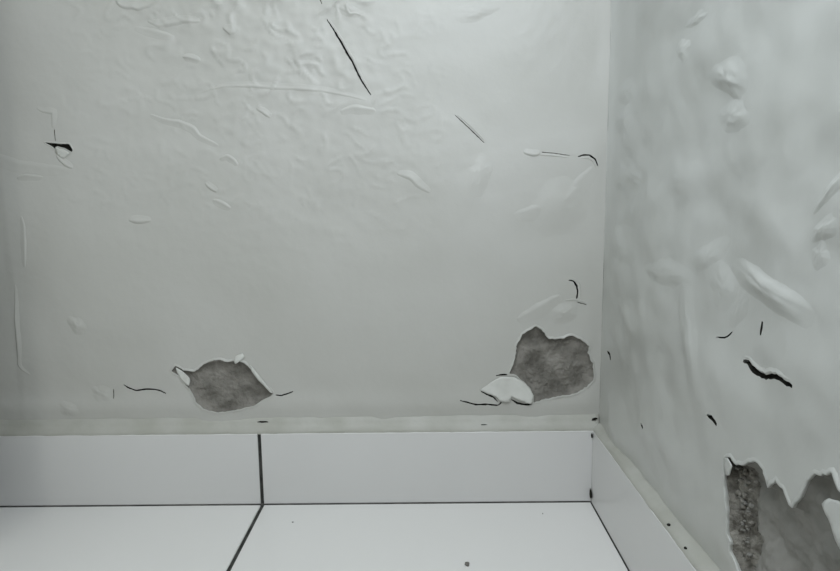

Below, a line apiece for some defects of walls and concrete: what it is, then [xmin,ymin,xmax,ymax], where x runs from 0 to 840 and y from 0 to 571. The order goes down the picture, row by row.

crack [320,0,371,95]
crack [455,114,484,143]
spalling [169,353,293,415]
spalling [460,324,596,406]
crack [744,356,792,388]
spalling [722,453,840,571]